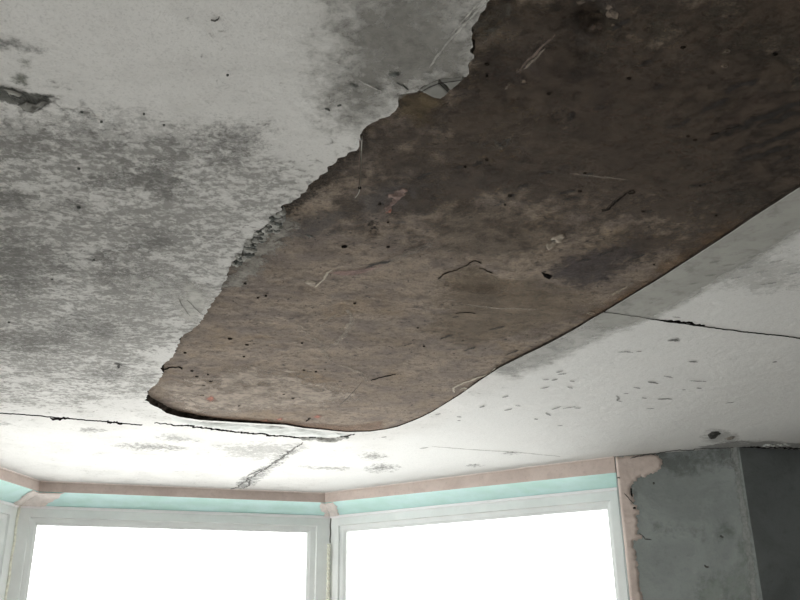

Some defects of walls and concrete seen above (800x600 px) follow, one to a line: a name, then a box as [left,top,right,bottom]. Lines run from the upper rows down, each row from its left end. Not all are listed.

spalling [0,86,53,113]
crack [604,311,800,339]
damp [164,367,354,414]
crack [0,413,322,489]